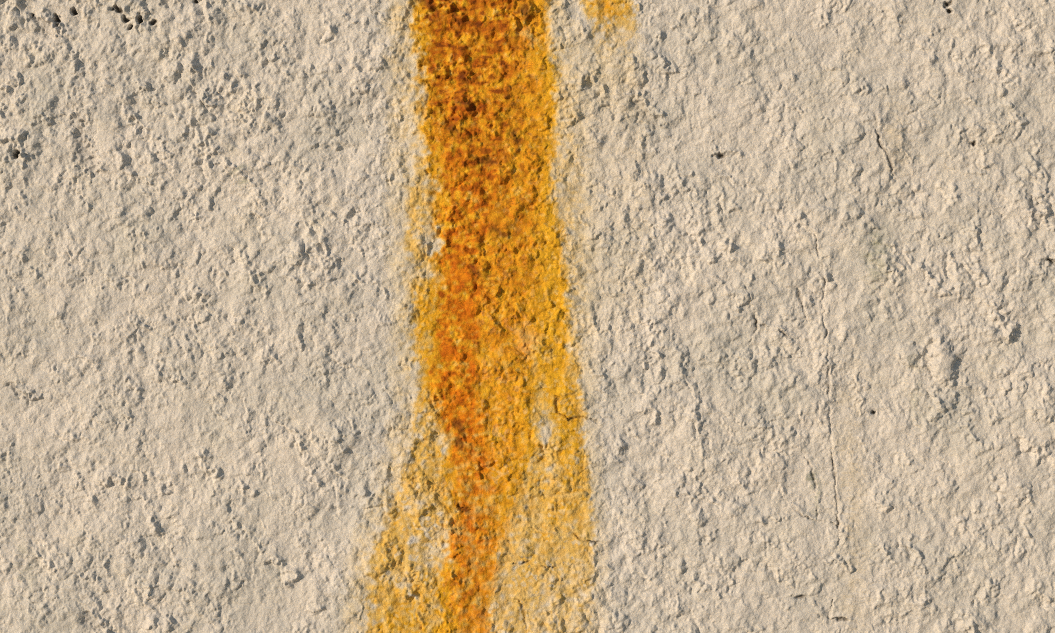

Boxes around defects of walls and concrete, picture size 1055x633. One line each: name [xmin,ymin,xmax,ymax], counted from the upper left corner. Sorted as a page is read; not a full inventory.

corrosion [334,0,656,633]
crack [745,234,841,544]